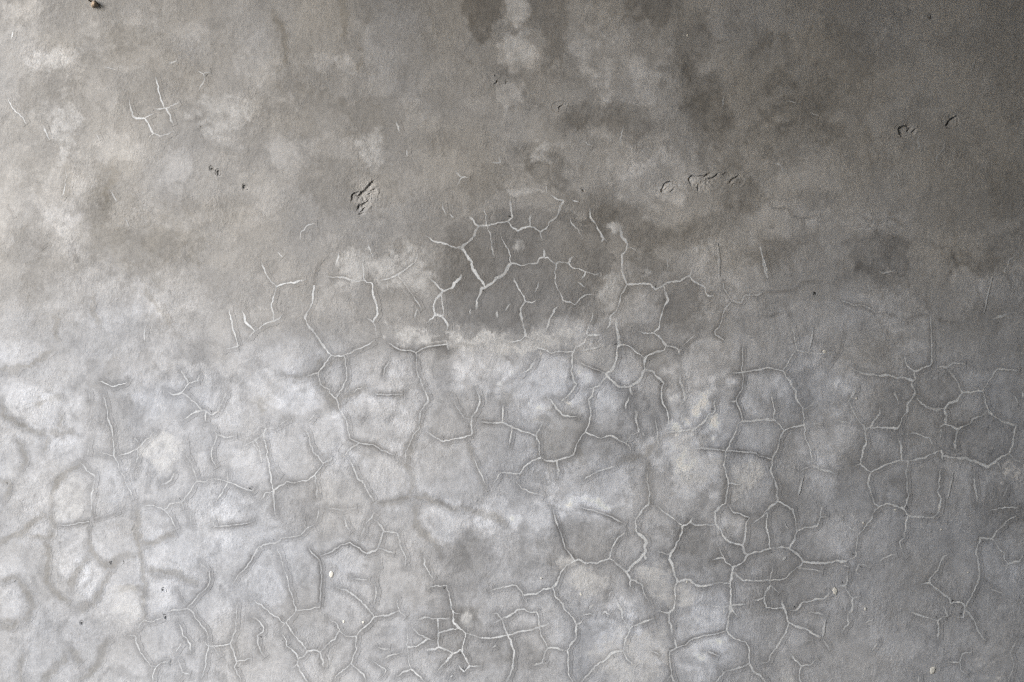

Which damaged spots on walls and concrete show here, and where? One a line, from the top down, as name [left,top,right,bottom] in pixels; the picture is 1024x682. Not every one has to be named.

crack [125,56,182,141]
spalling [345,168,392,221]
crack [56,183,1024,682]